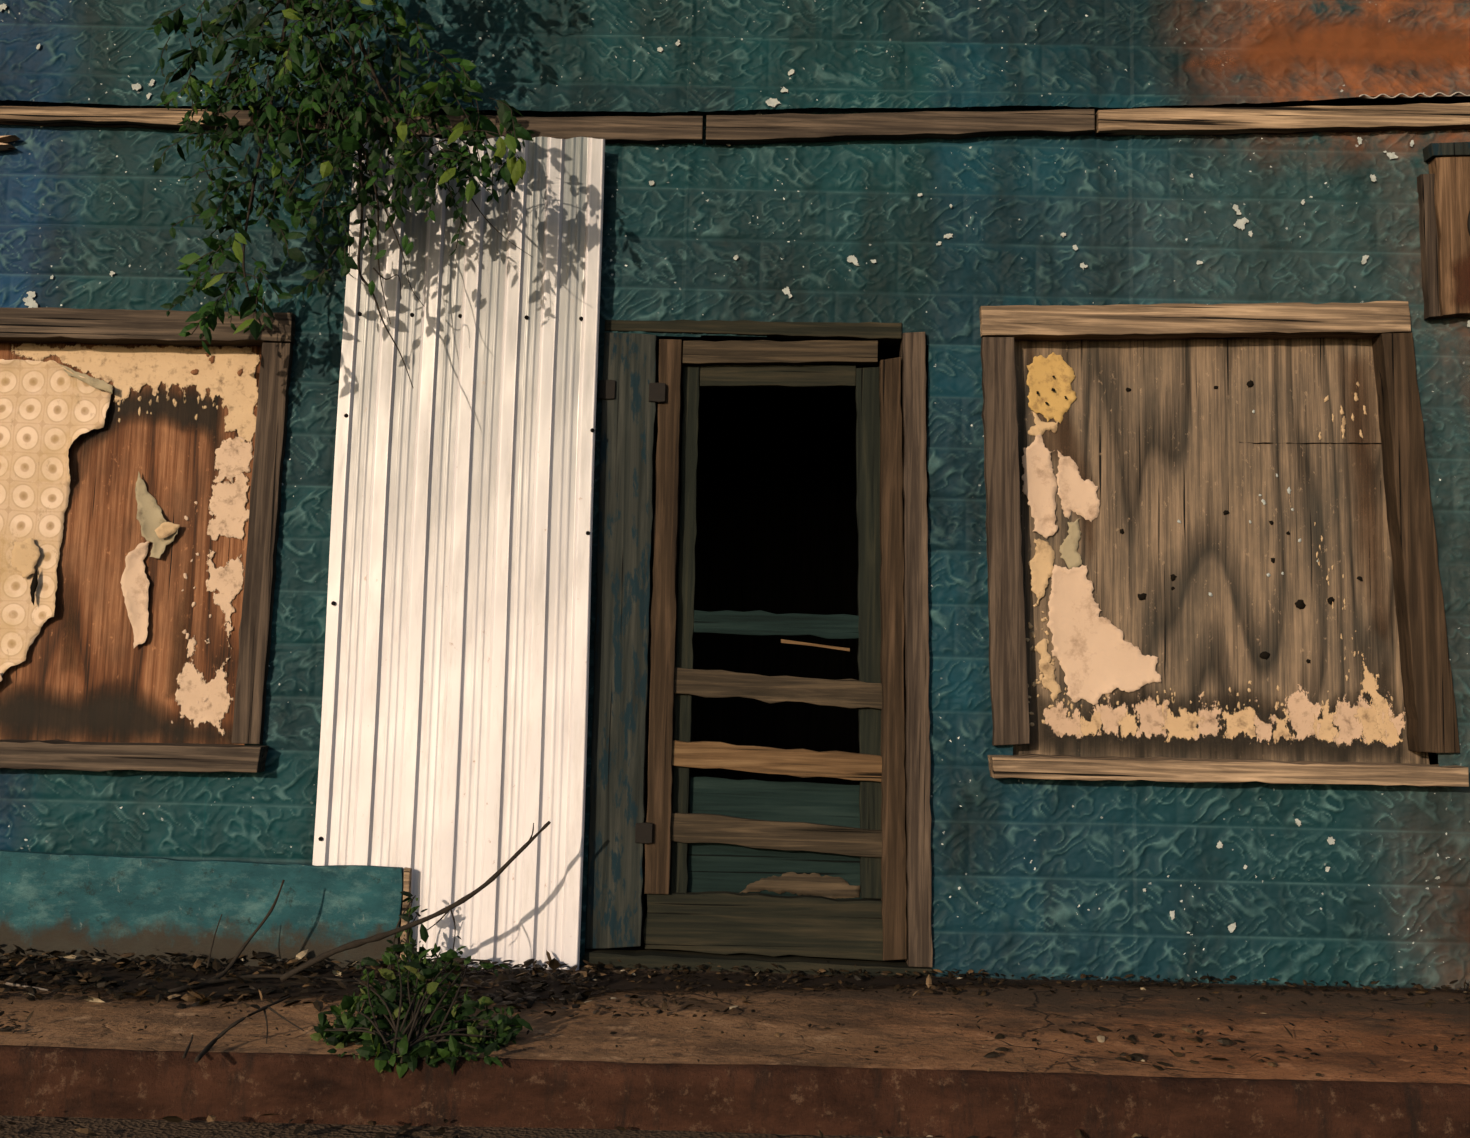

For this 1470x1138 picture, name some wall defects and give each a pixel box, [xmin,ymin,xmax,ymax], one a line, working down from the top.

peeling [1318,382,1367,440]
peeling [11,343,260,736]
peeling [1043,630,1406,748]